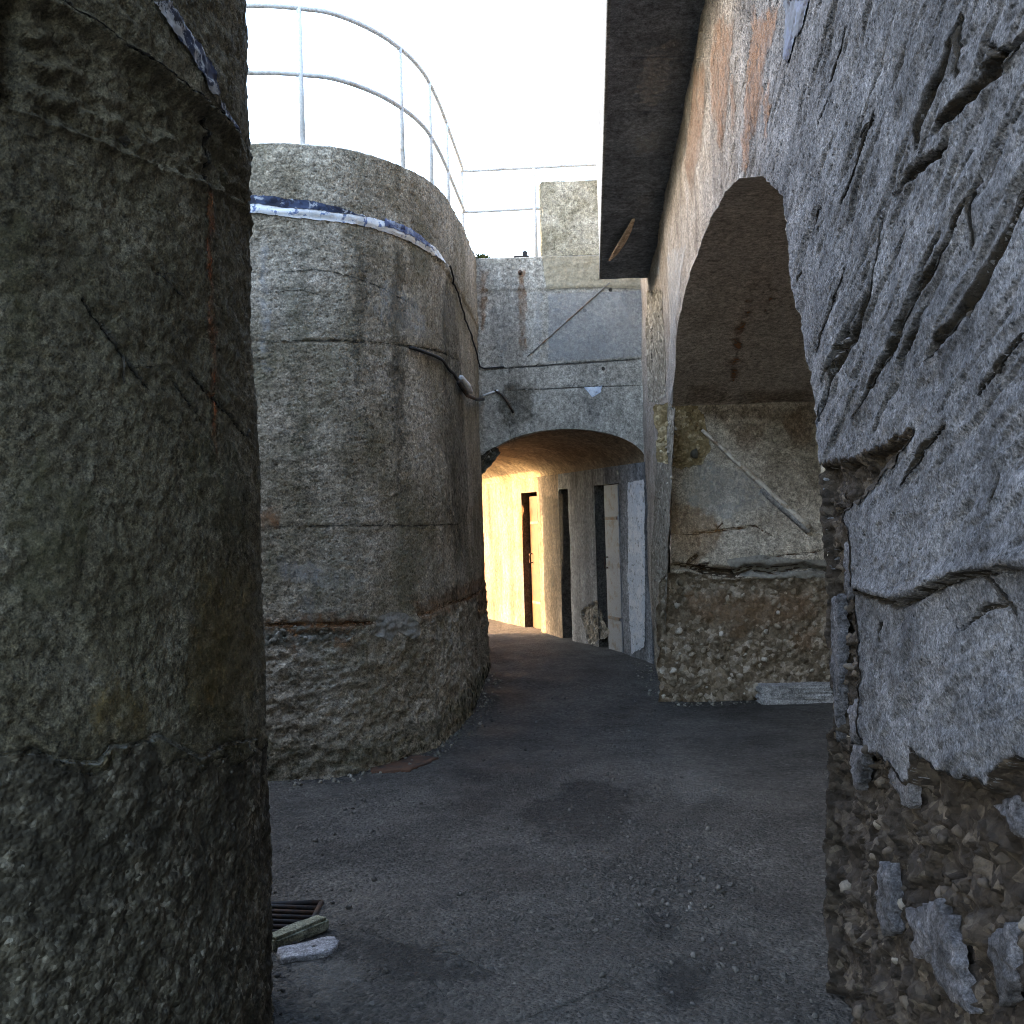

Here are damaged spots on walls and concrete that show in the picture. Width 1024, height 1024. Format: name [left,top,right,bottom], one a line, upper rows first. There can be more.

crack [81,297,250,437]
spalling [627,288,1024,1024]